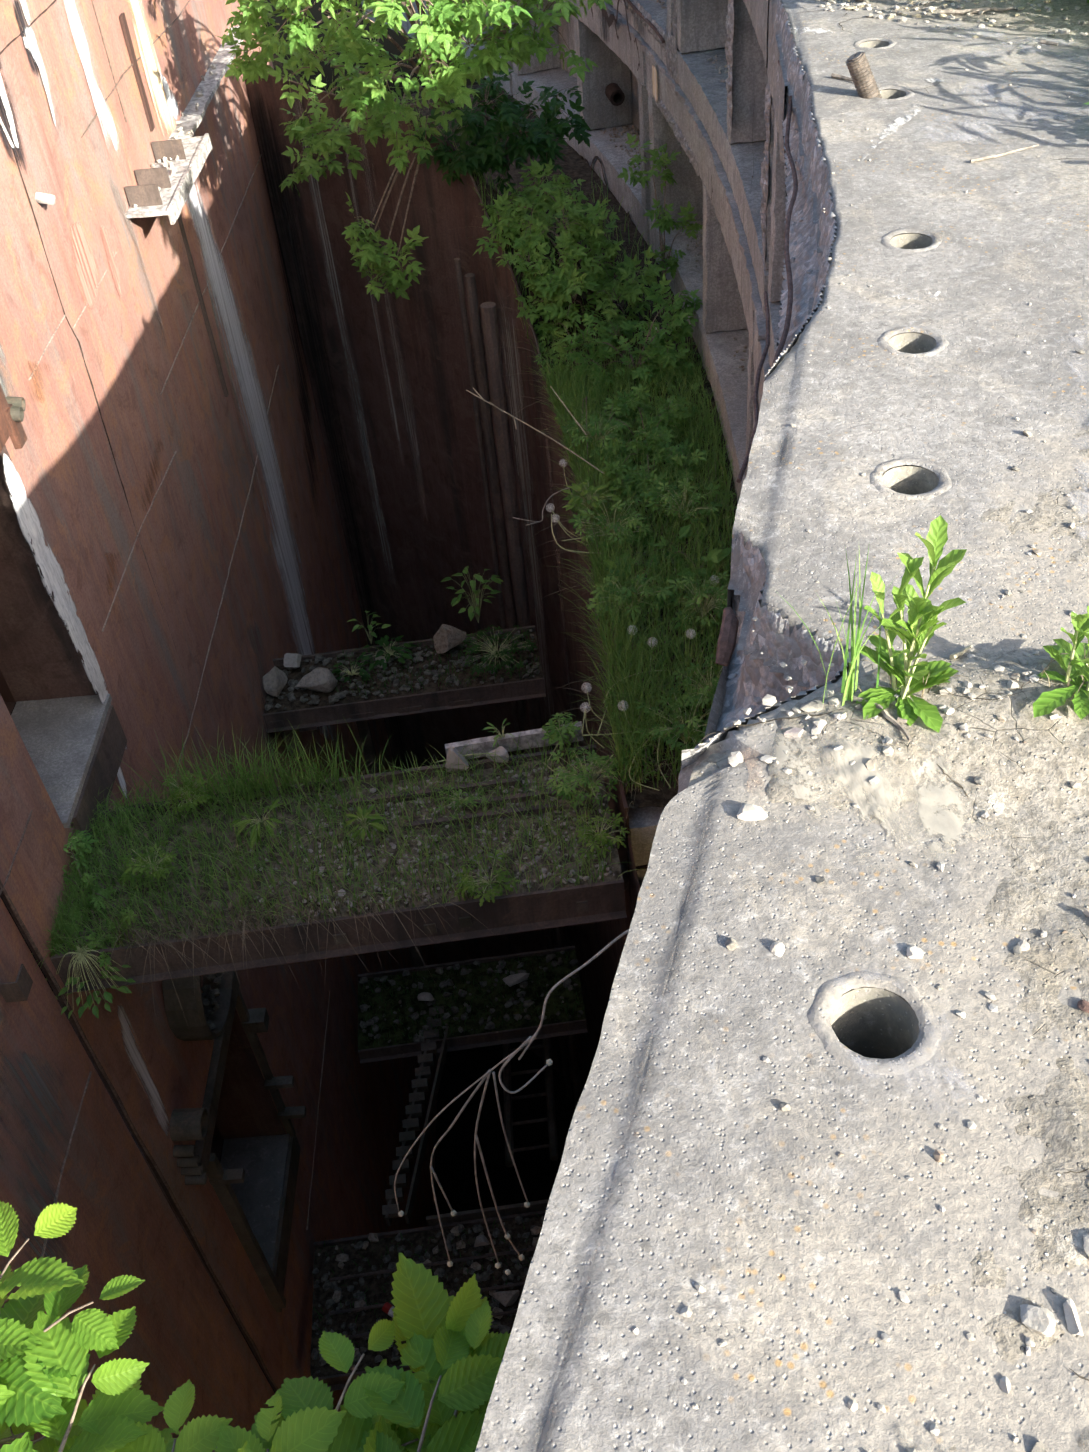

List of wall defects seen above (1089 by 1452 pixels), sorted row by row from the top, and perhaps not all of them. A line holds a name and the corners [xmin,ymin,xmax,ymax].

rust [71,223,98,308]
spalling [737,0,837,483]
spalling [681,531,851,769]